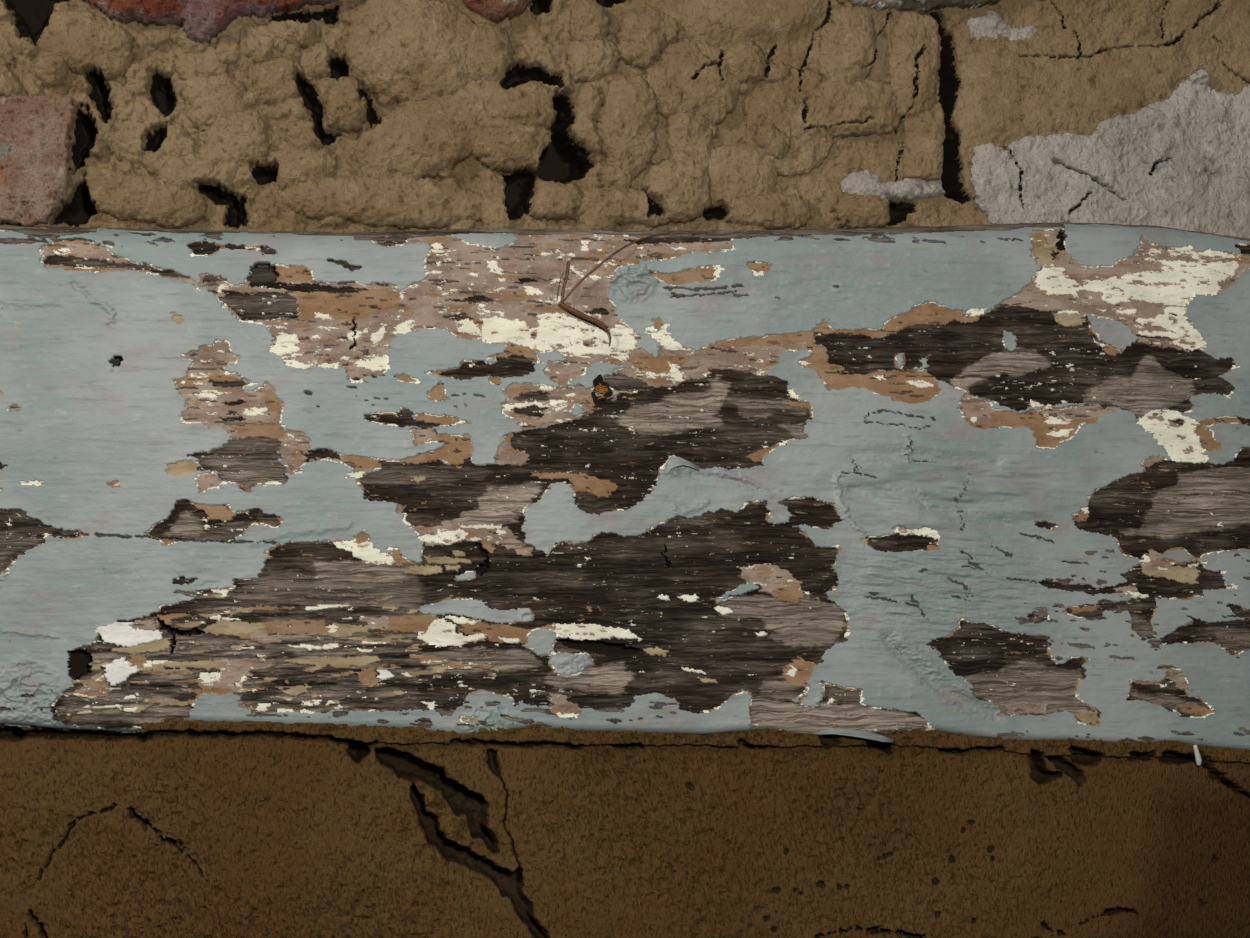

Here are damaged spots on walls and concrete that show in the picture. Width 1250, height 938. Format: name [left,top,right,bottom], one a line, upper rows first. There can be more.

crack [1027,0,1250,83]
crack [764,0,927,182]
spalling [1186,69,1211,86]
crack [1005,148,1024,205]
crack [1149,158,1170,175]
crack [1055,162,1127,251]
peeling [0,228,1250,787]
crack [612,742,643,750]
crack [737,740,767,750]
crack [938,746,1005,754]
crack [0,727,581,938]